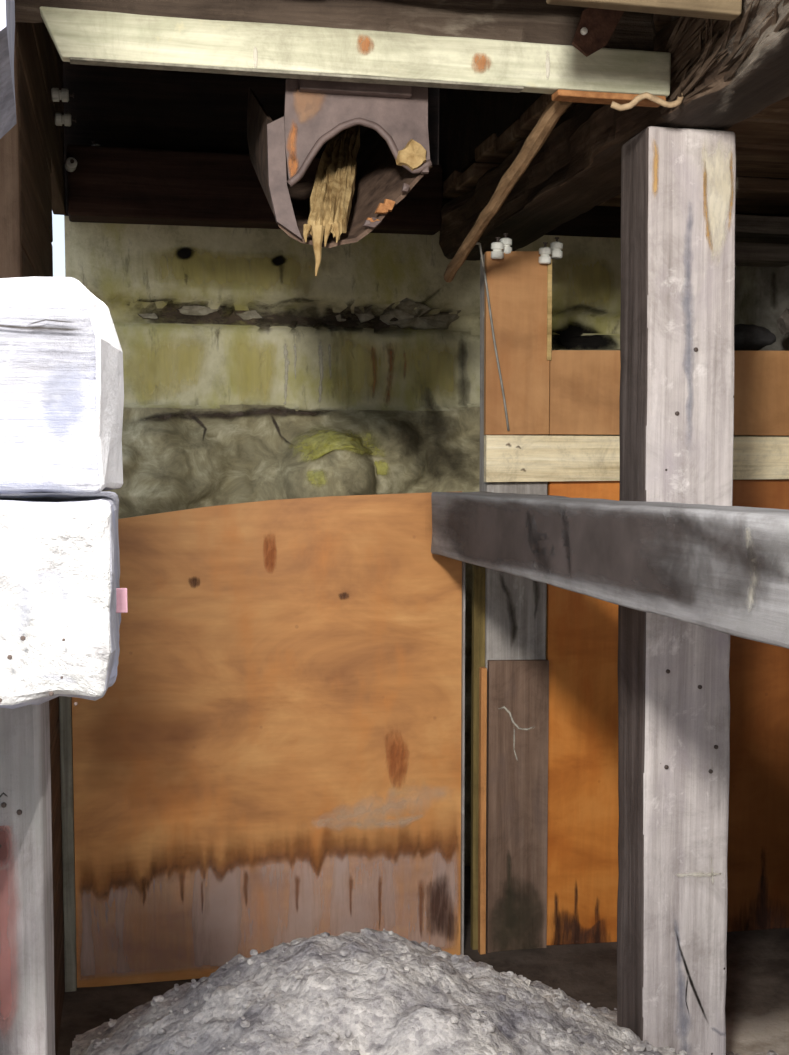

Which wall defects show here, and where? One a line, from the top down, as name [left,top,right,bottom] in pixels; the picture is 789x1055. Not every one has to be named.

rust [288,92,321,177]
rust [395,139,429,174]
rust [362,183,410,229]
leakage [173,253,298,288]
spalling [336,298,461,330]
leakage [395,390,462,471]
leakage [81,839,456,975]
leakage [554,887,607,945]